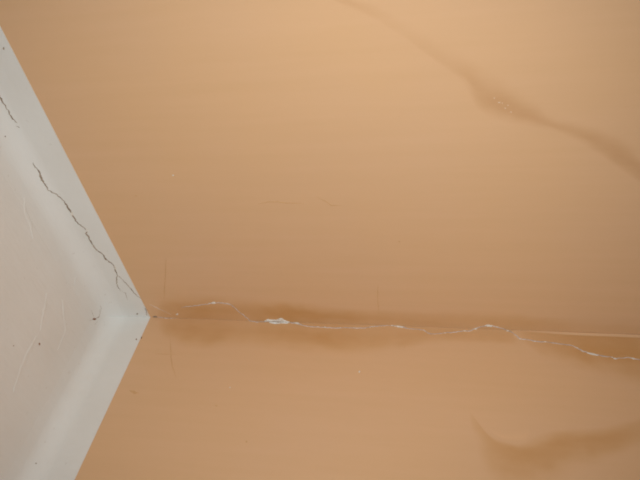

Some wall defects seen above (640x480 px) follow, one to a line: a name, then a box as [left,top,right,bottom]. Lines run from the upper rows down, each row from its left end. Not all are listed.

crack [33,164,263,323]
crack [290,322,640,360]